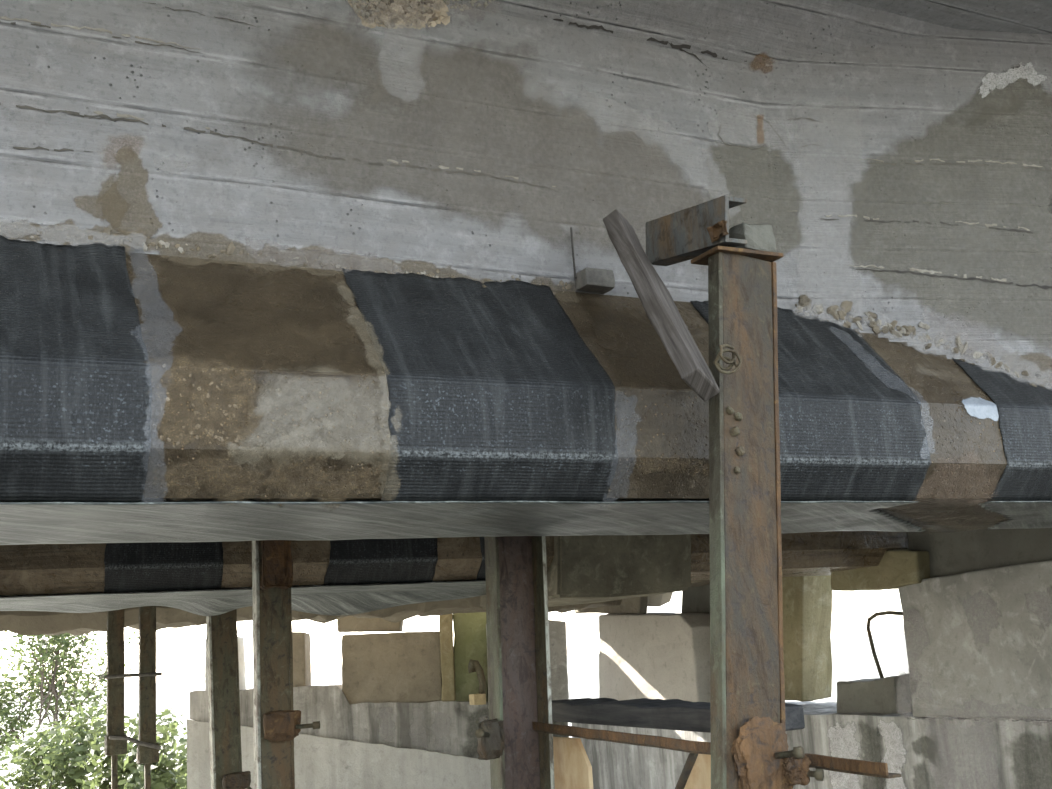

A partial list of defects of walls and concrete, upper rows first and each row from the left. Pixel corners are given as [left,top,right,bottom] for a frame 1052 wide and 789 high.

spalling [348,0,495,29]
crack [544,15,613,34]
crack [647,37,747,68]
damp [273,23,801,253]
damp [74,148,162,245]
damp [852,62,1052,348]